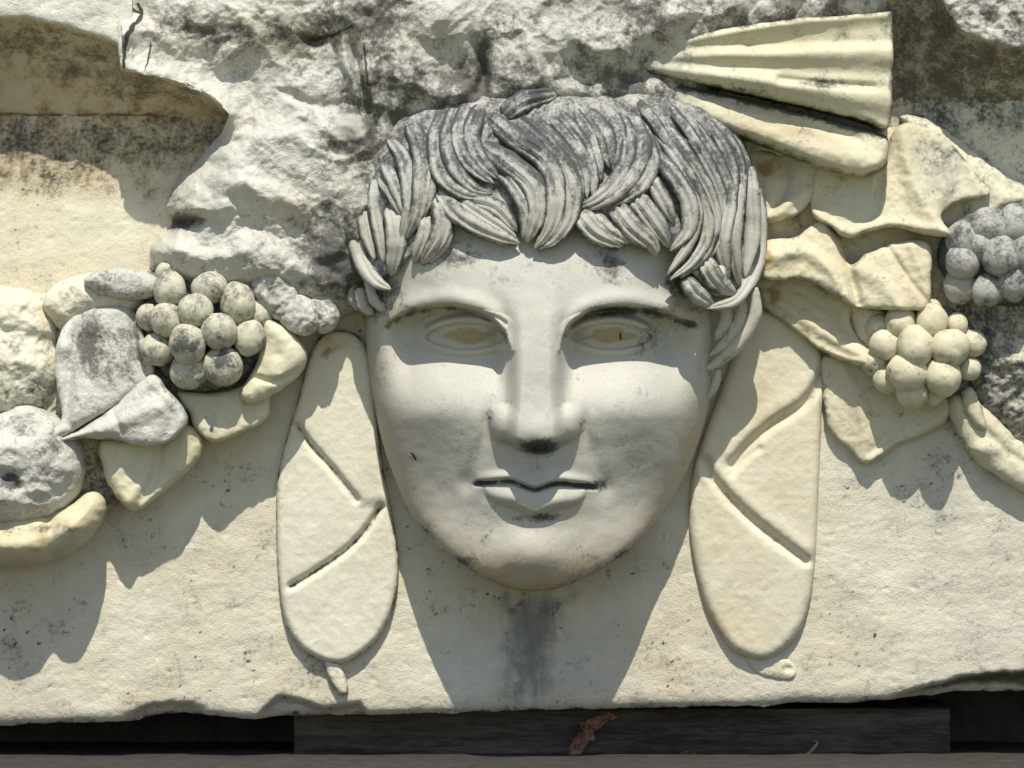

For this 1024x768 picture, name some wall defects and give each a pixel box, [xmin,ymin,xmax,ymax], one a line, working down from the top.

crack [122,2,151,69]